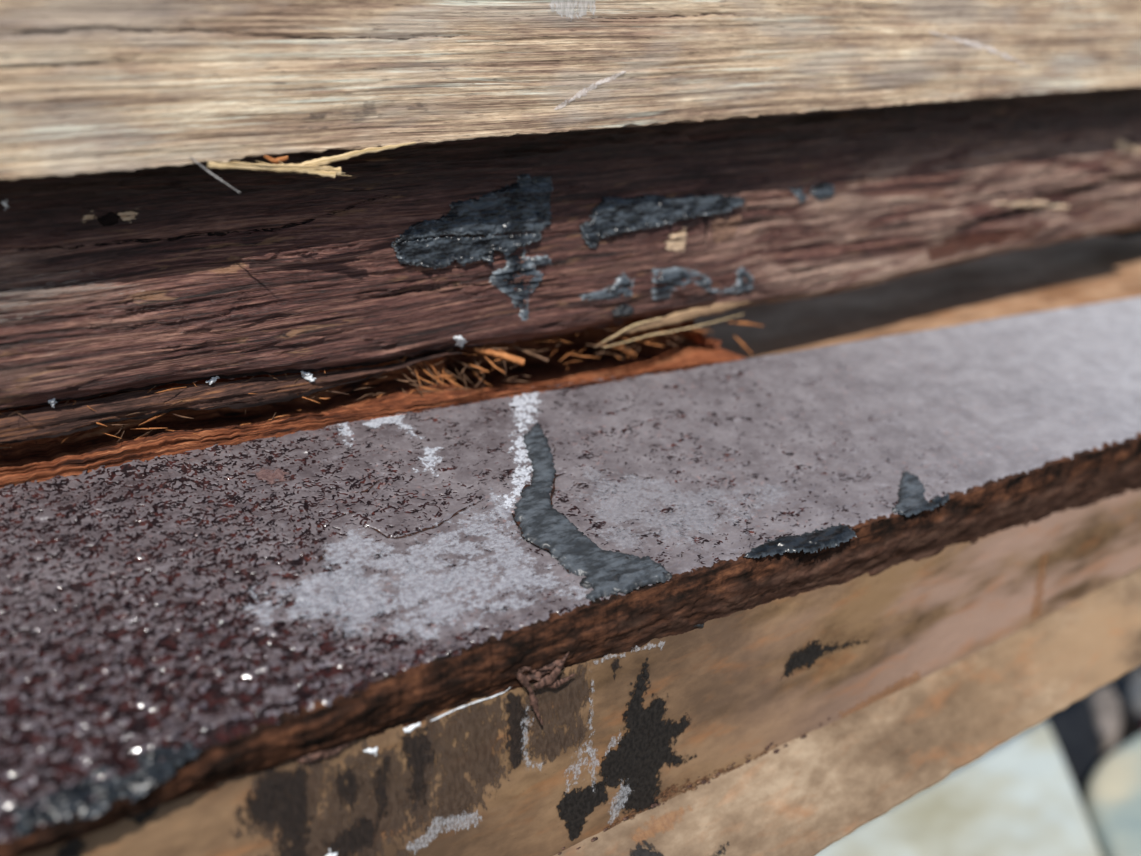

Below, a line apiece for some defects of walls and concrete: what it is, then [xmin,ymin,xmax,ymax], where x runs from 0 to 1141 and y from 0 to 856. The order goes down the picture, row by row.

peeling [390,173,553,320]
peeling [580,193,746,252]
peeling [579,272,634,320]
peeling [651,266,754,301]
efflorescence [338,415,442,476]
efflorescence [498,392,541,509]
peeling [512,423,672,602]
peeling [743,523,857,558]
peeling [892,469,951,517]